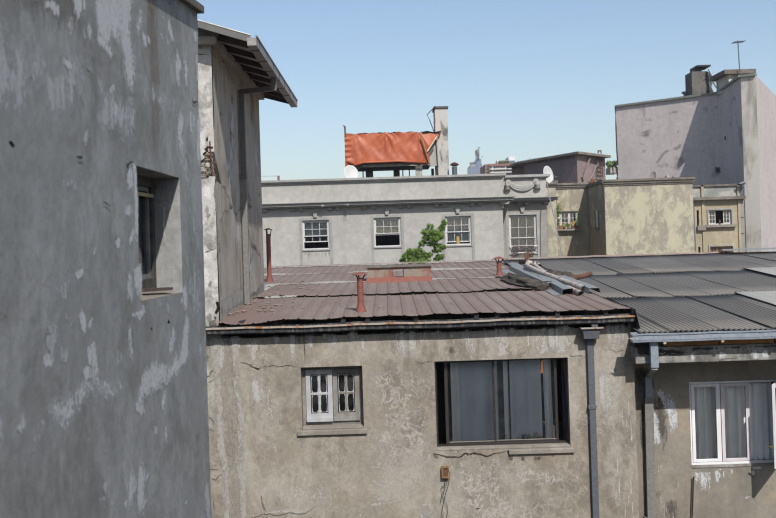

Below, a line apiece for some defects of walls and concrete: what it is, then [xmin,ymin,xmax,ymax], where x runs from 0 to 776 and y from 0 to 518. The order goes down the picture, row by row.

peeling [45,0,60,16]
peeling [73,0,139,92]
spalling [201,138,242,253]
water stain [598,371,644,445]
water stain [652,381,678,444]
crack [433,449,509,458]